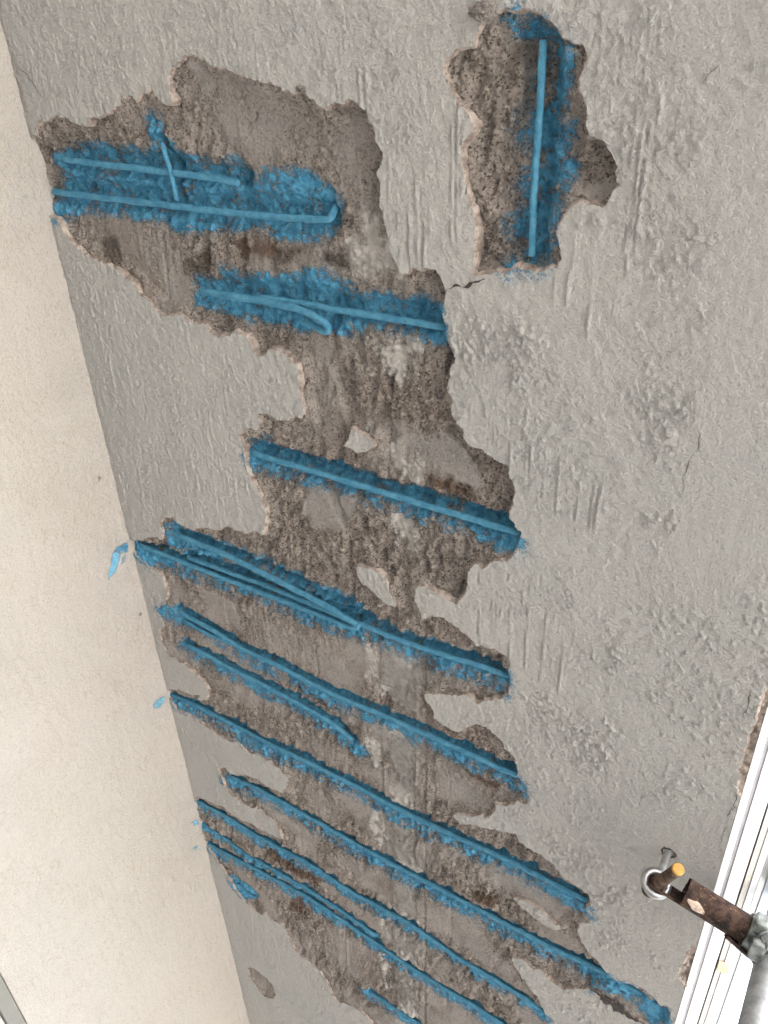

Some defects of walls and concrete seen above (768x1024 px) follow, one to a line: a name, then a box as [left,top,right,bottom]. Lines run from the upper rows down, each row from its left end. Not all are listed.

spalling [443,0,619,281]
crack [450,279,484,289]
spalling [31,55,672,1024]